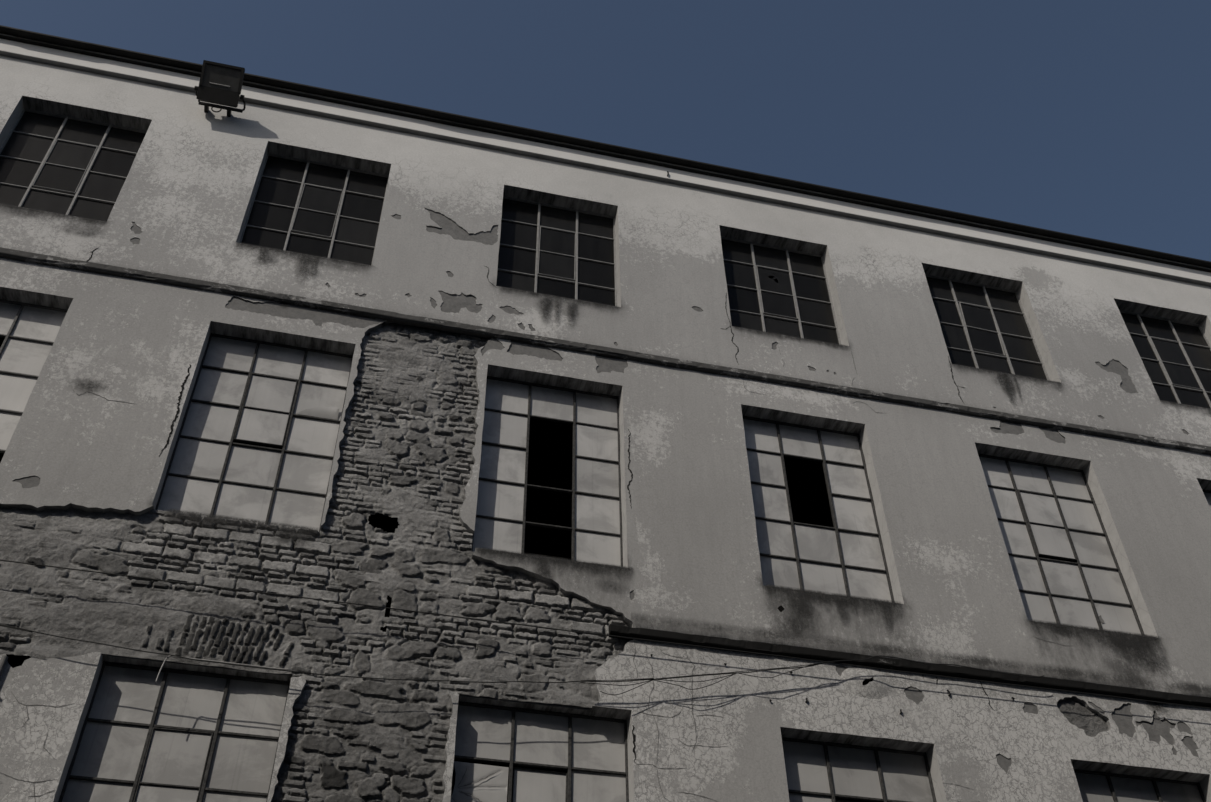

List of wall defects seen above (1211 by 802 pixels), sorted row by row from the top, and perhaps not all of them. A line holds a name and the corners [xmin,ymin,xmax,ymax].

peeling [130,222,142,244]
peeling [424,207,498,245]
crack [159,365,191,456]
crack [720,293,765,395]
peeling [1095,359,1138,394]
flaking render [0,291,631,802]
damp [636,585,1160,687]
crack [632,641,722,802]
flaking render [1057,694,1198,757]
damp [1169,683,1211,694]